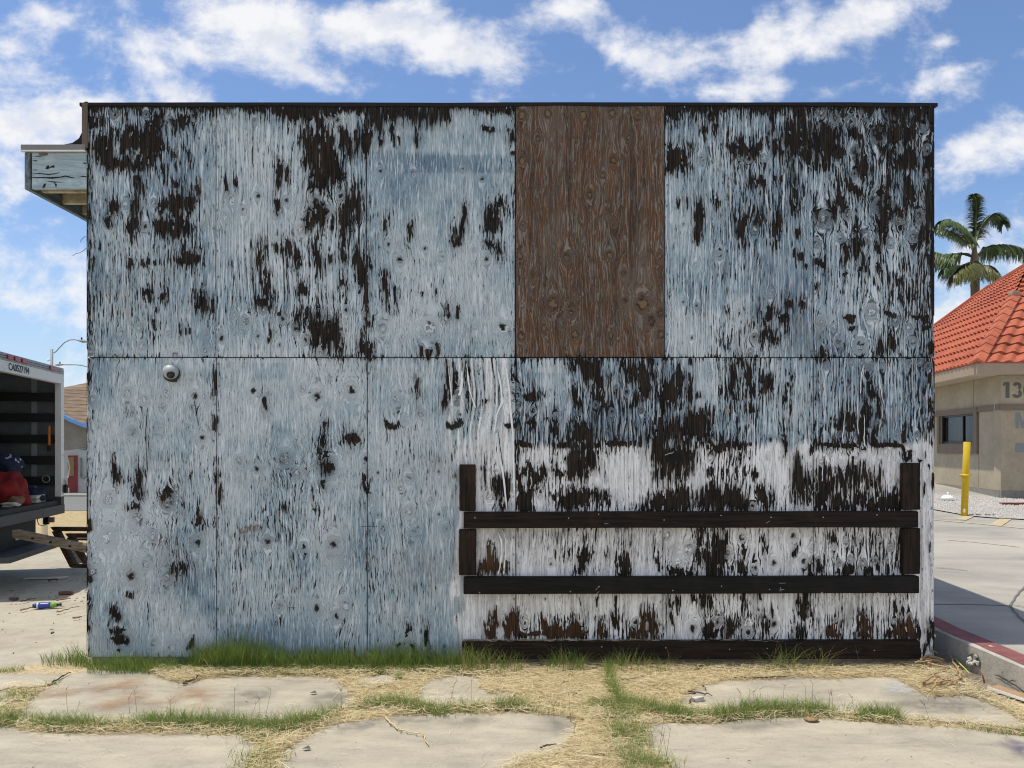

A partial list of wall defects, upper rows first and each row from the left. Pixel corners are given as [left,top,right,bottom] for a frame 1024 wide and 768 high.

peeling [85,106,519,364]
peeling [665,106,934,345]
peeling [728,357,795,414]
peeling [480,350,774,511]
peeling [781,376,935,511]
peeling [110,459,143,512]
peeling [477,540,510,576]
peeling [653,528,753,576]
peeling [109,590,138,652]
peeling [483,595,659,640]
peeling [668,594,736,639]
peeling [826,600,936,653]